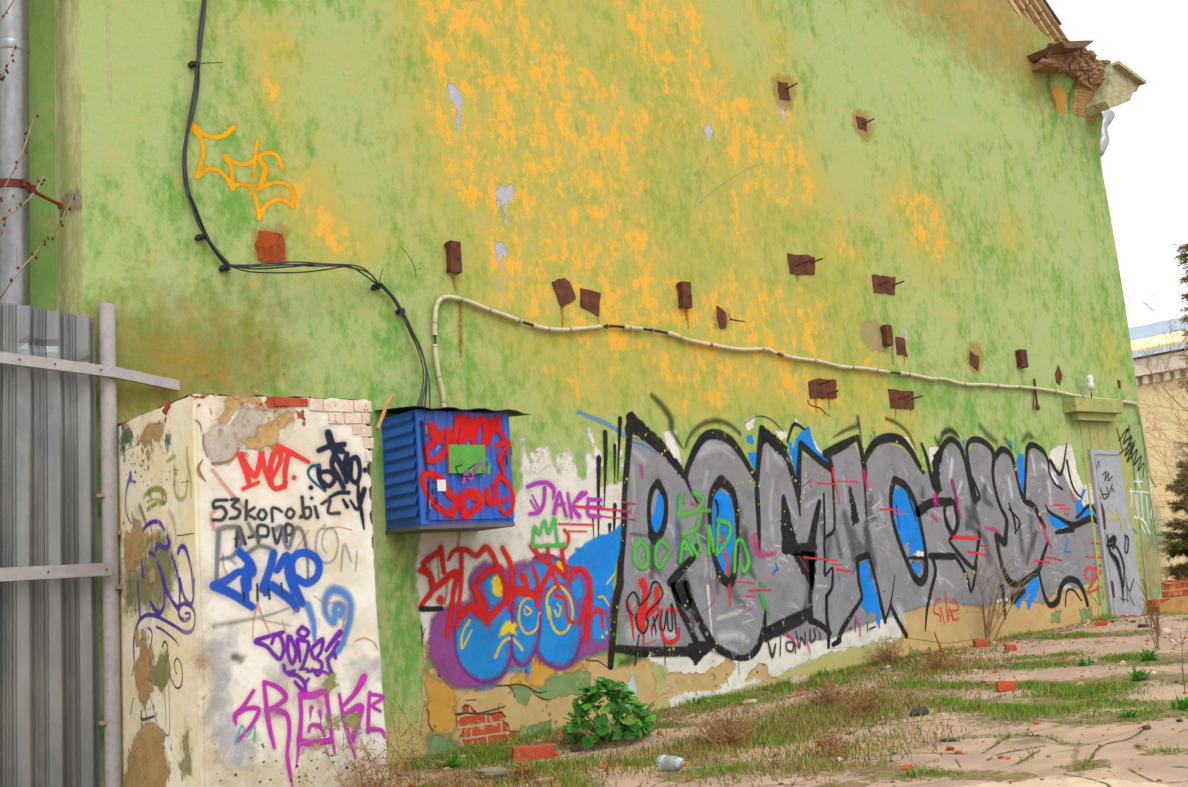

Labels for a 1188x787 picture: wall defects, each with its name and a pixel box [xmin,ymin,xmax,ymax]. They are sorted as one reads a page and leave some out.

corrosion [773,77,795,107]
spalling [121,386,311,486]
spalling [121,513,160,584]
spalling [124,629,191,787]
peeling [322,673,339,693]
peeling [326,713,361,732]
spalling [410,646,778,757]
spalling [250,743,378,783]